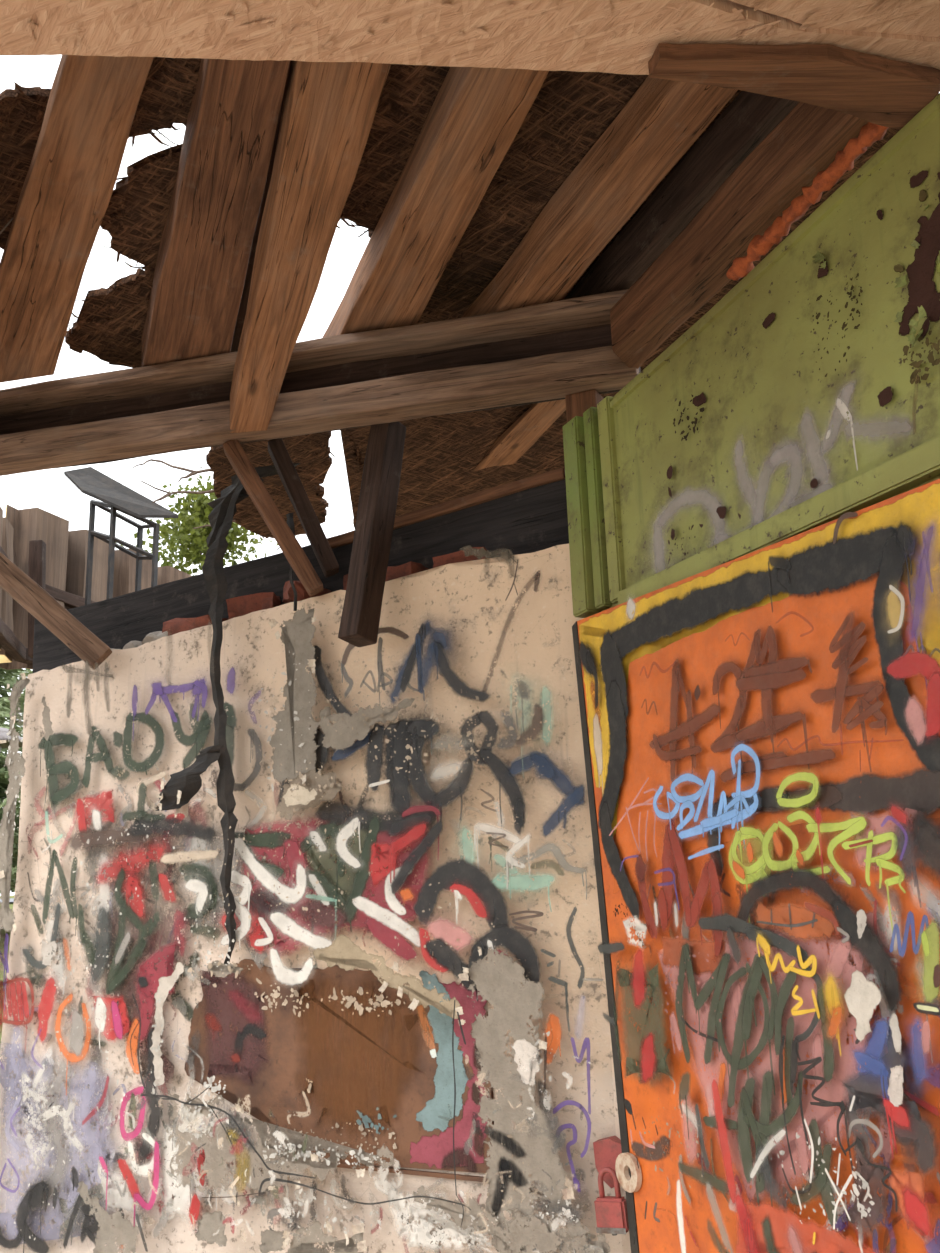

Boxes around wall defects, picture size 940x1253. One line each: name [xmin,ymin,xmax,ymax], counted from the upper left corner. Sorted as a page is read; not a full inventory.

peeling [894,170,940,384]
peeling [812,268,863,377]
peeling [877,386,893,407]
spalling [385,547,491,582]
peeling [668,524,703,564]
peeling [716,506,744,536]
peeling [73,828,184,915]
peeling [150,574,610,1253]
peeling [0,936,128,1187]
peeling [77,1181,140,1253]